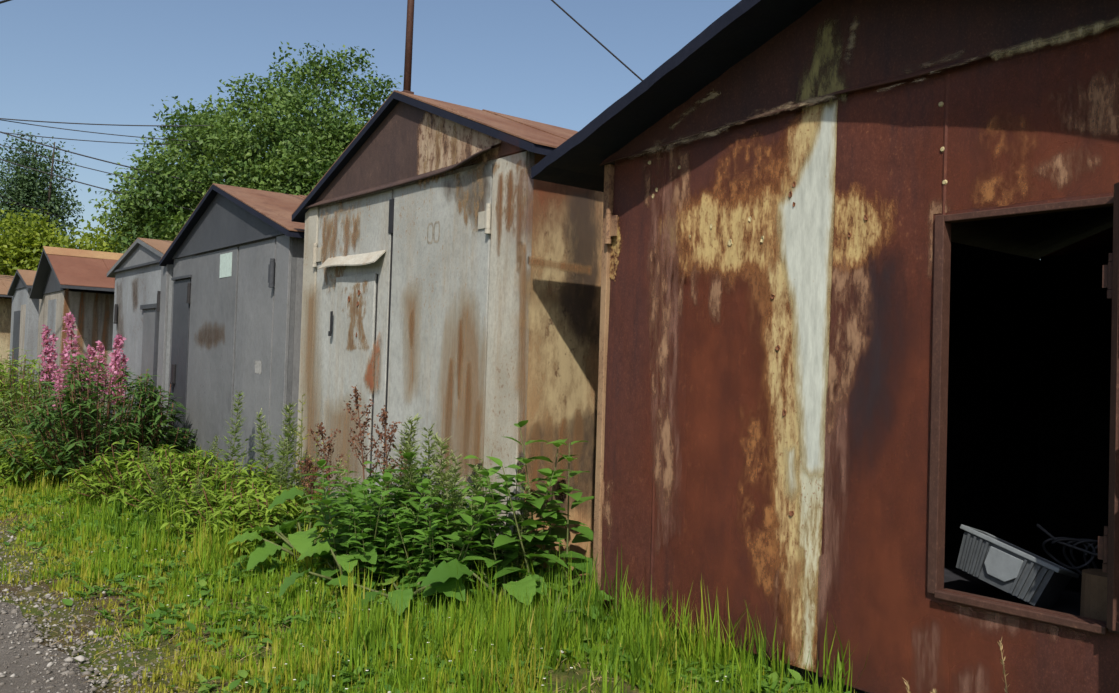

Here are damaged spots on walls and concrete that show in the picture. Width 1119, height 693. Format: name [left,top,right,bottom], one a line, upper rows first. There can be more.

rust [683,133,789,250]
rust [974,116,1100,208]
rust [1063,70,1119,137]
water stain [561,194,600,343]
rust [345,281,380,393]
rust [407,297,416,392]
rust [440,303,485,481]
rust [657,223,871,671]
peeling [635,95,894,670]
rust [959,668,984,693]